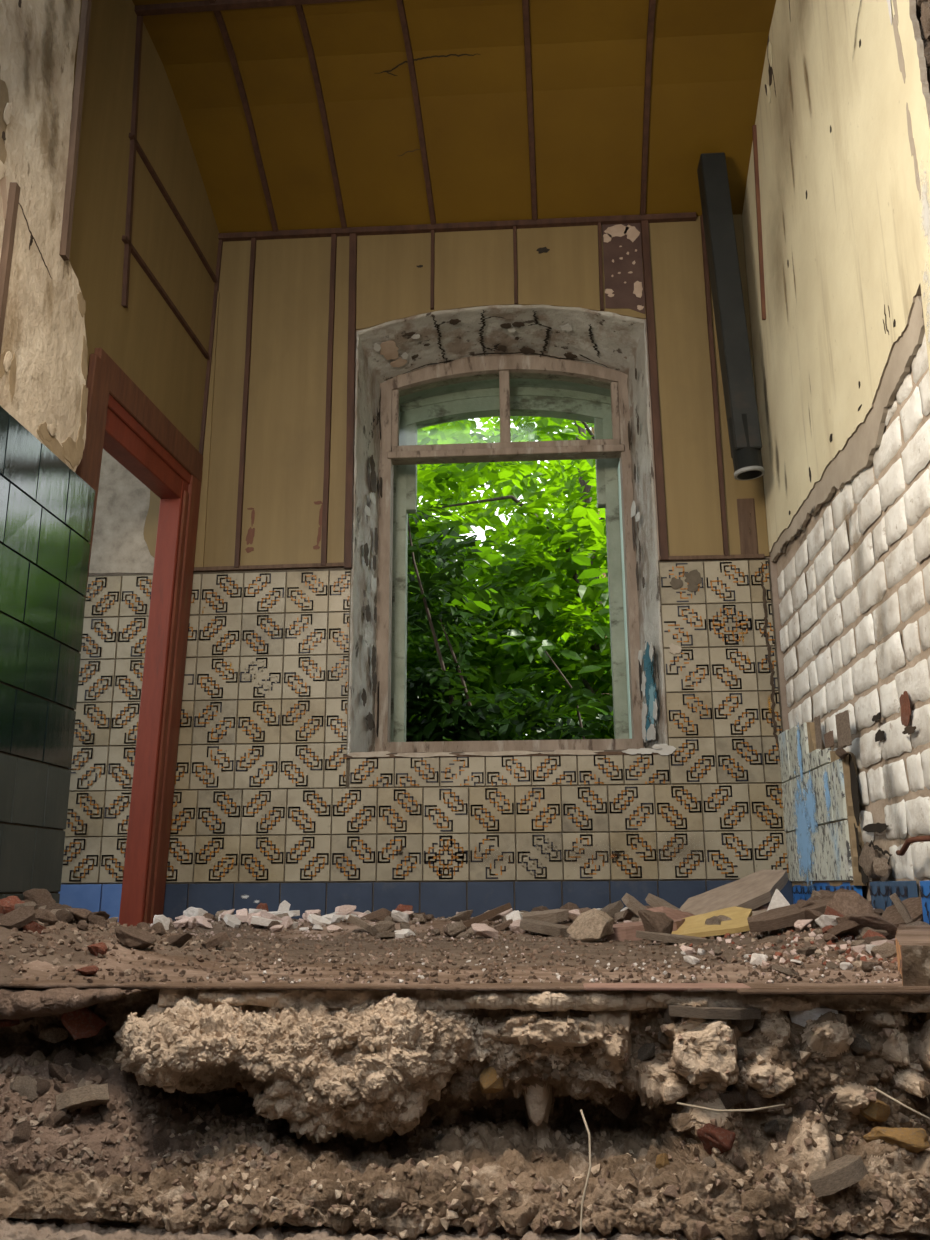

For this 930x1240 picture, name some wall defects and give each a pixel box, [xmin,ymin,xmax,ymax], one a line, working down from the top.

crack [381,54,480,76]
peeling [887,0,906,84]
spalling [916,0,930,81]
peeling [906,103,921,199]
peeling [0,0,88,472]
peeling [602,223,645,314]
crack [368,310,607,510]
flaking render [777,334,930,886]
peeling [622,641,676,755]